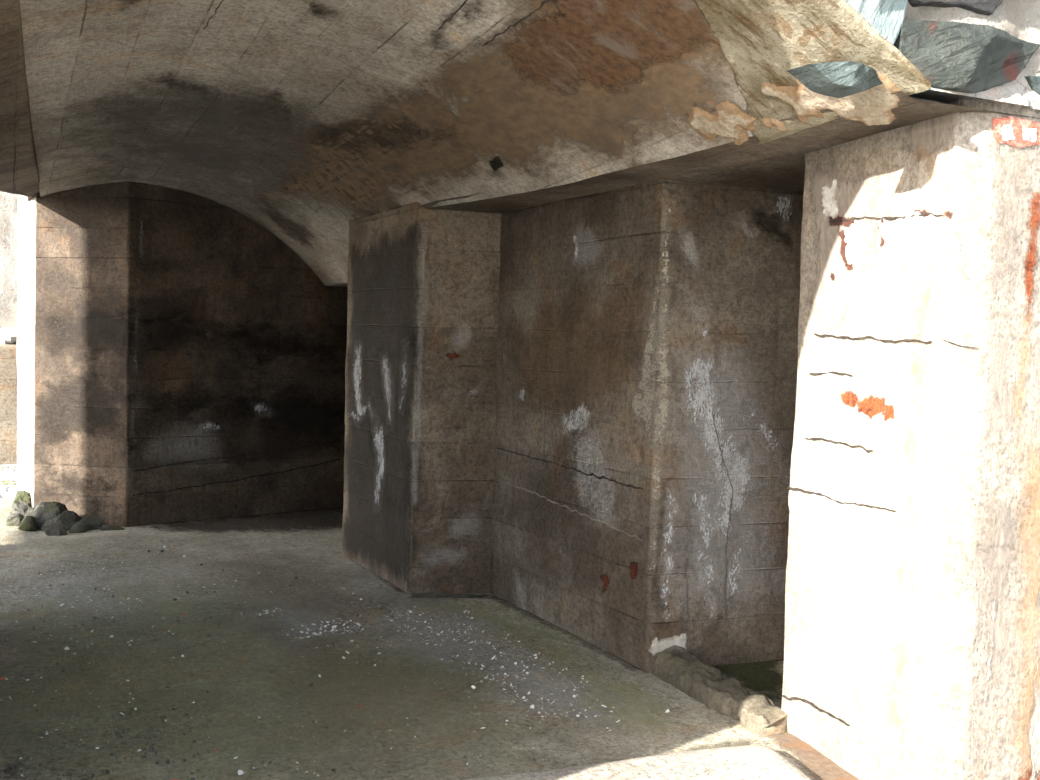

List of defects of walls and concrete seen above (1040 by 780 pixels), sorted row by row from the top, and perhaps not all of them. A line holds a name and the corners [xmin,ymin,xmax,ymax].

water stain [280,0,726,215]
water stain [256,194,310,244]
spalling [821,179,840,220]
spalling [844,220,860,264]
spalling [877,211,951,267]
rust [1024,193,1040,322]
crack [814,333,977,348]
crack [809,369,853,377]
rust [840,390,894,421]
crack [804,438,873,452]
crack [497,448,644,490]
crack [787,487,896,512]